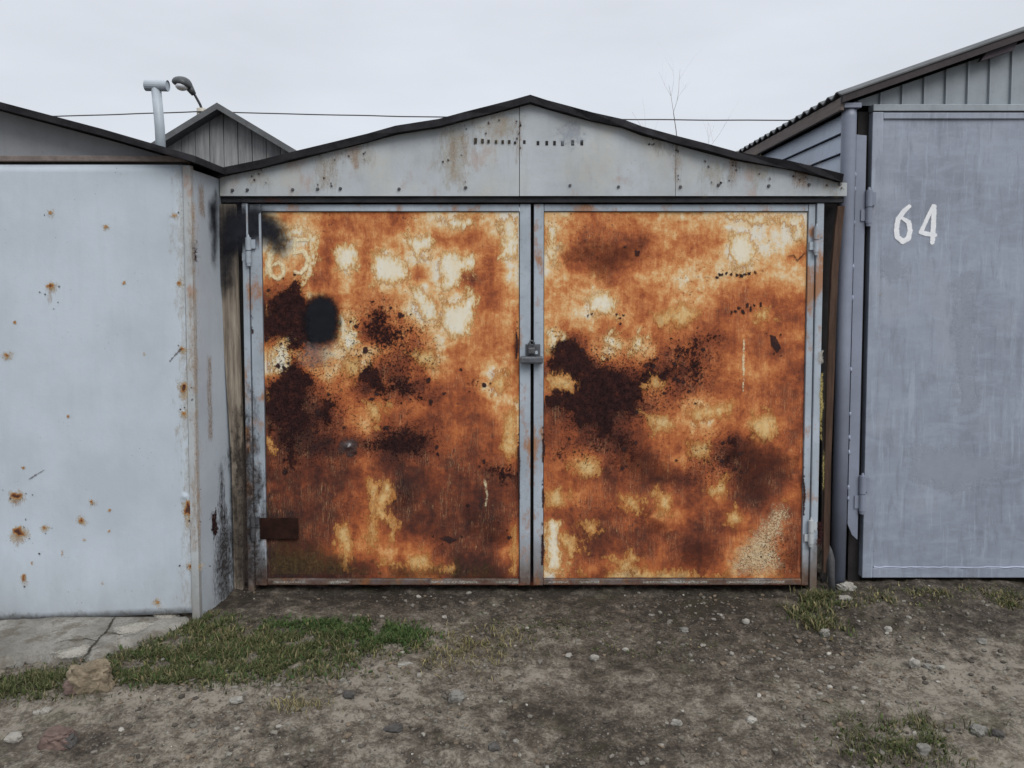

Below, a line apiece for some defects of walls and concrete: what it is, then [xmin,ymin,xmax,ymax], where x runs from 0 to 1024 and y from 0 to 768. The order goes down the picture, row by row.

rust [350,301,446,405]
rust [766,333,782,357]
rust [264,274,346,475]
rust [544,327,717,478]
rust [354,423,440,458]
rust [478,459,518,489]
crack [61,616,128,658]